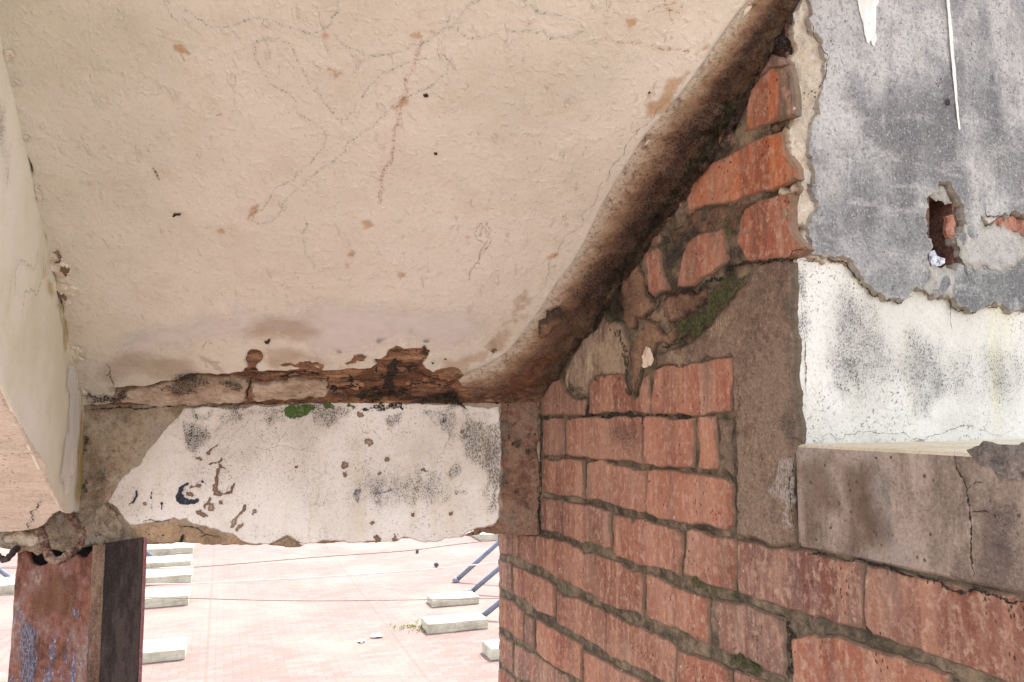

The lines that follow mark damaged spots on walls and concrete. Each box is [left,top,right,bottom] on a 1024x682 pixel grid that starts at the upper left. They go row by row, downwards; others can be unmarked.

water stain [359,0,790,512]
spalling [930,185,956,239]
water stain [165,374,352,452]
spalling [249,339,464,418]
peeling [538,307,563,339]
water stain [776,267,810,448]
water stain [822,286,1024,425]
spalling [0,444,257,566]
crack [788,408,1024,604]